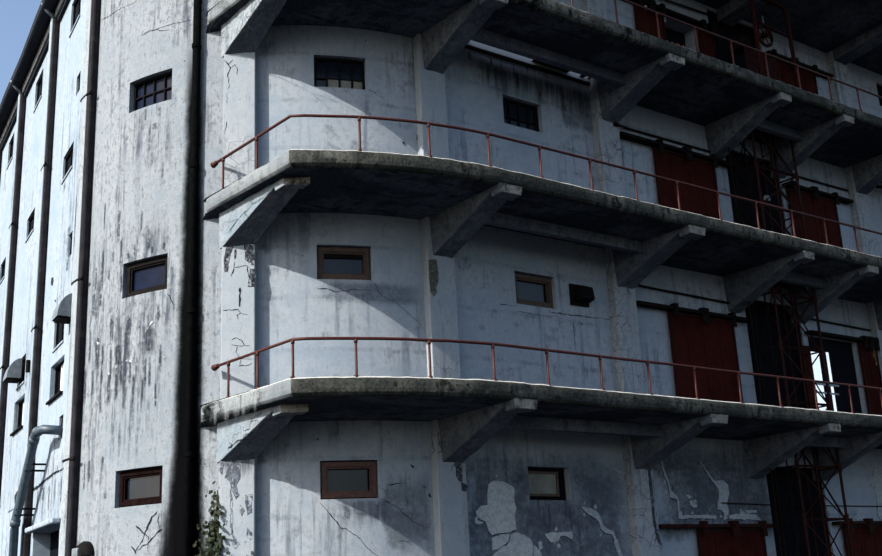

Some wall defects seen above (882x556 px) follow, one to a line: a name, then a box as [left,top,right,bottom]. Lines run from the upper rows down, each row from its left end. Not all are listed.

peeling [224,244,256,287]
leakage [83,213,165,412]
leakage [160,72,220,556]
crack [318,283,417,321]
crack [321,504,378,556]
peeling [475,475,573,556]
peeling [582,501,623,556]